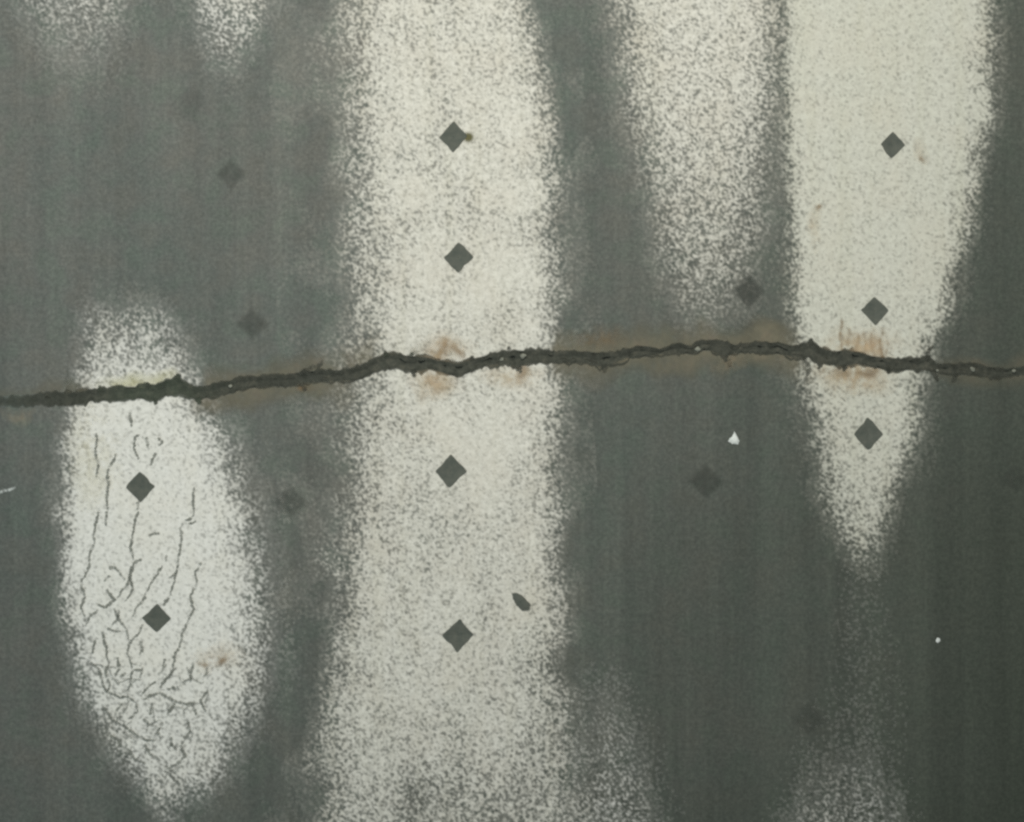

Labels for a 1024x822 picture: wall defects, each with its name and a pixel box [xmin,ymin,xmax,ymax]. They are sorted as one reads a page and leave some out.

crack [8,338,1018,769]